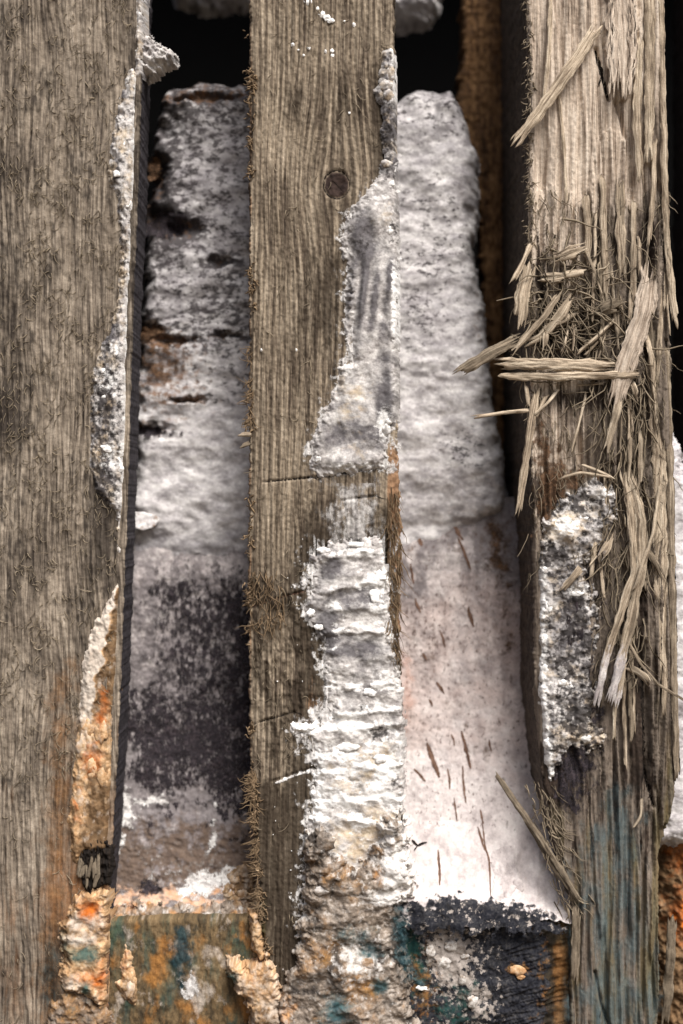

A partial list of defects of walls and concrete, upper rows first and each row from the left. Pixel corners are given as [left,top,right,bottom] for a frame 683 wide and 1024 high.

corrosion [67,585,119,864]
leakage [119,562,256,855]
corrosion [55,887,120,1009]
peeling [115,944,138,1006]